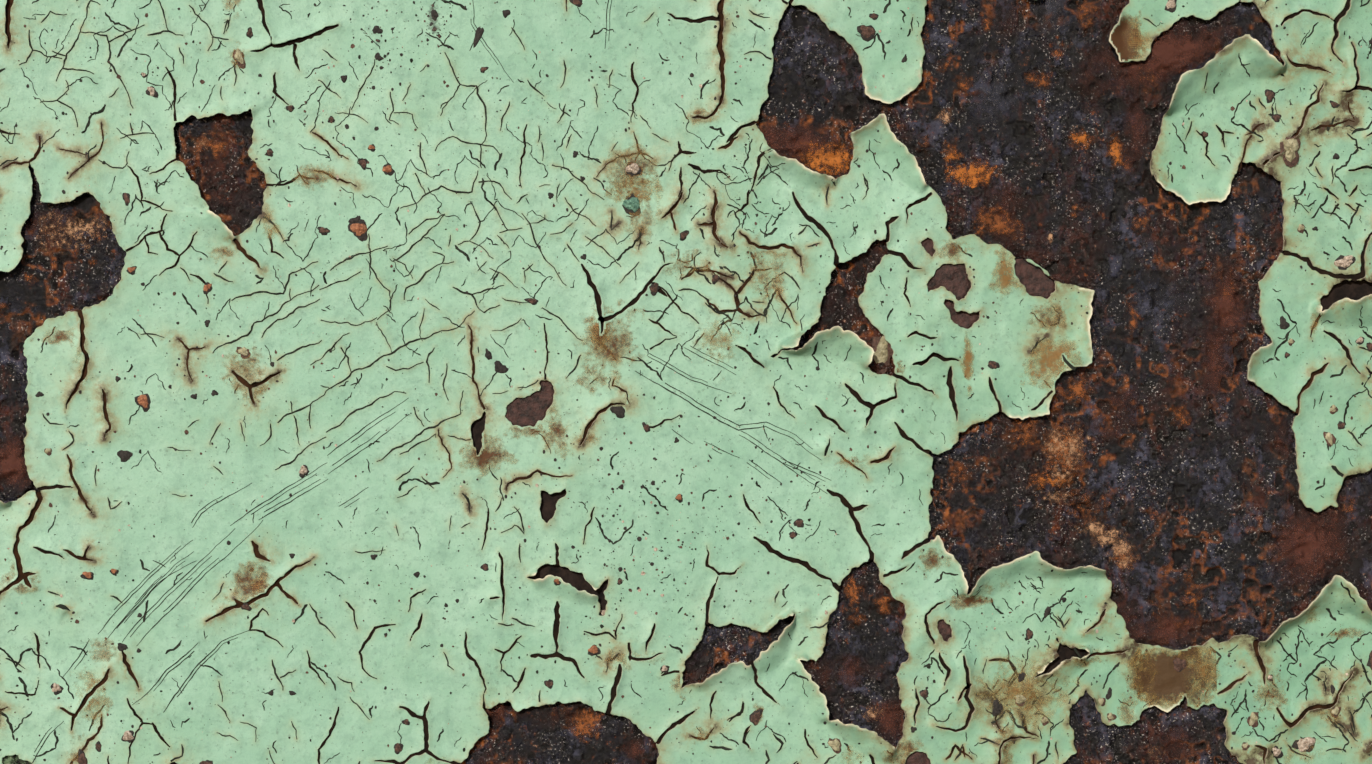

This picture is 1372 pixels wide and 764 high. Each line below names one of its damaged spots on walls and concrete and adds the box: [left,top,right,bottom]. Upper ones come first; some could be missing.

spalling [117,450,133,462]
peeling [471,411,486,455]
crack [0,0,1053,764]
peeling [505,380,554,427]
crack [1019,299,1076,371]
corrosion [754,0,1372,764]
crack [1167,0,1372,498]
crack [913,571,1151,764]
crack [1205,582,1372,764]